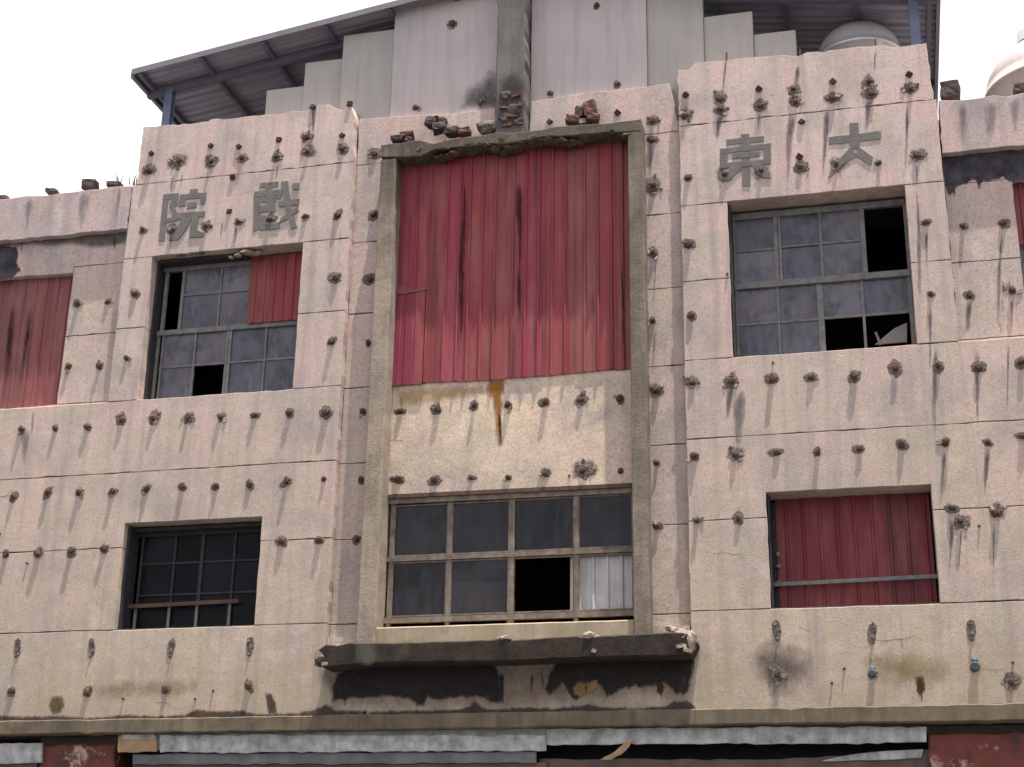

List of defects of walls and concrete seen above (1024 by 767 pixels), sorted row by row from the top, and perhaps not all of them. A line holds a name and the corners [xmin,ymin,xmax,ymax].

spalling [416,91,630,164]
rust [487,380,504,442]
spalling [665,626,698,654]
water stain [0,660,695,721]
rust [917,676,925,699]